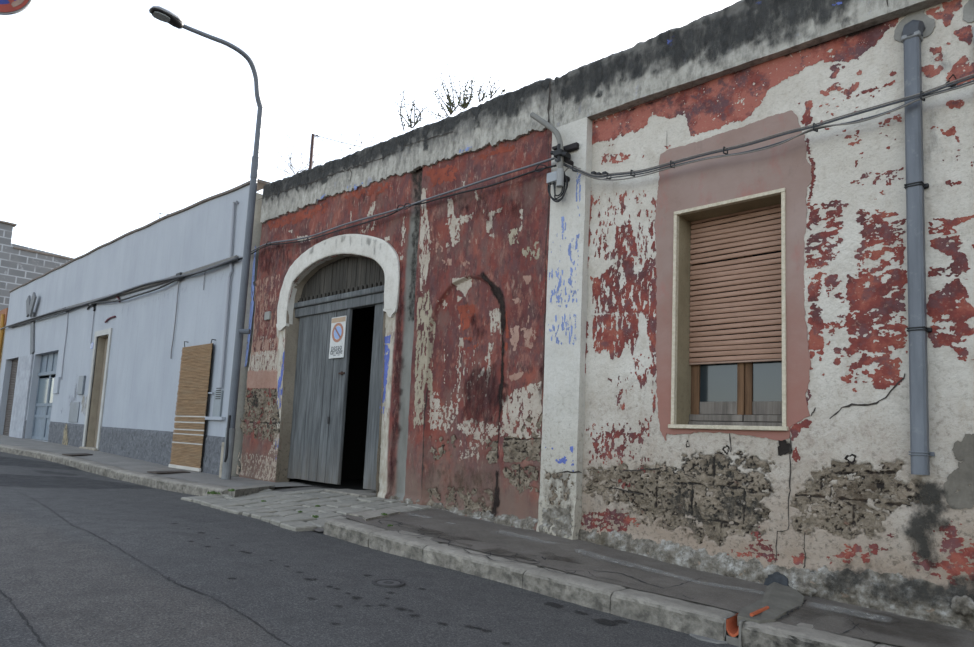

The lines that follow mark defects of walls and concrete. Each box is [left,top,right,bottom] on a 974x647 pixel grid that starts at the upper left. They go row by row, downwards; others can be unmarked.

damp [263,0,849,201]
peeling [922,0,974,85]
peeling [592,18,908,392]
peeling [926,215,974,362]
flaking render [236,246,285,481]
flaking render [413,165,779,562]
crack [811,373,905,419]
crack [0,590,46,647]
crack [27,495,293,647]
flaking render [790,460,933,564]
damp [904,480,949,565]
peeling [912,521,974,585]